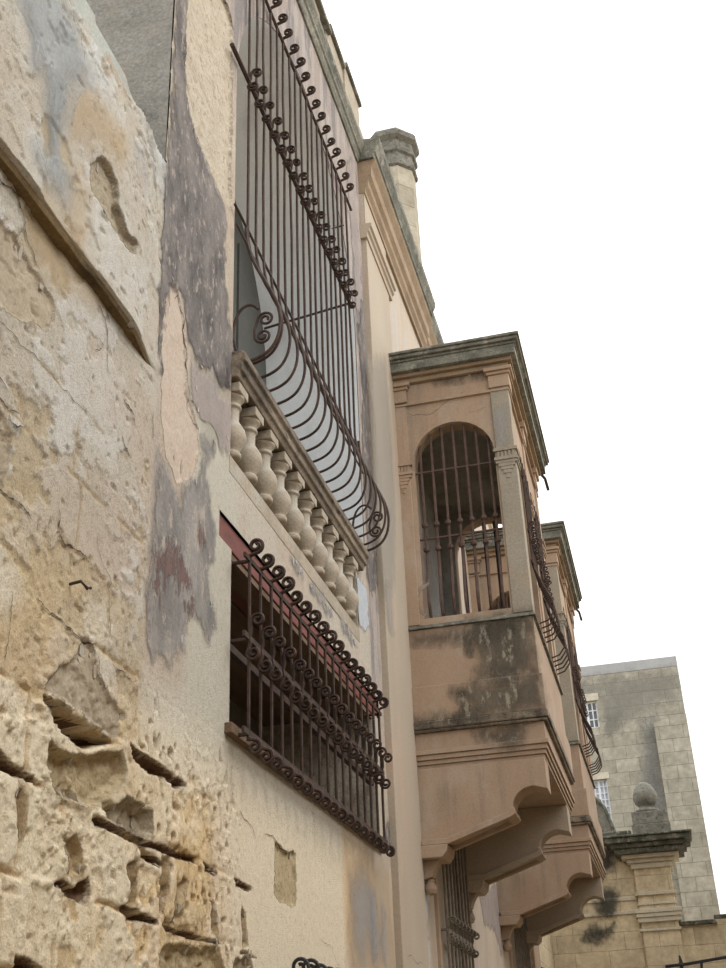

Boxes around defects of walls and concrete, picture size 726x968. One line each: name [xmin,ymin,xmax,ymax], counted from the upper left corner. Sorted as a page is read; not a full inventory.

crack [0,179,43,276]
flaking render [89,157,140,254]
peeling [146,0,234,667]
crack [0,377,23,428]
crack [122,400,154,456]
crack [38,507,132,691]
leakage [413,614,542,747]
spalling [43,634,154,841]
spalling [159,911,253,968]
flaking render [274,843,297,907]
leakage [583,888,617,945]
leakage [603,848,622,875]